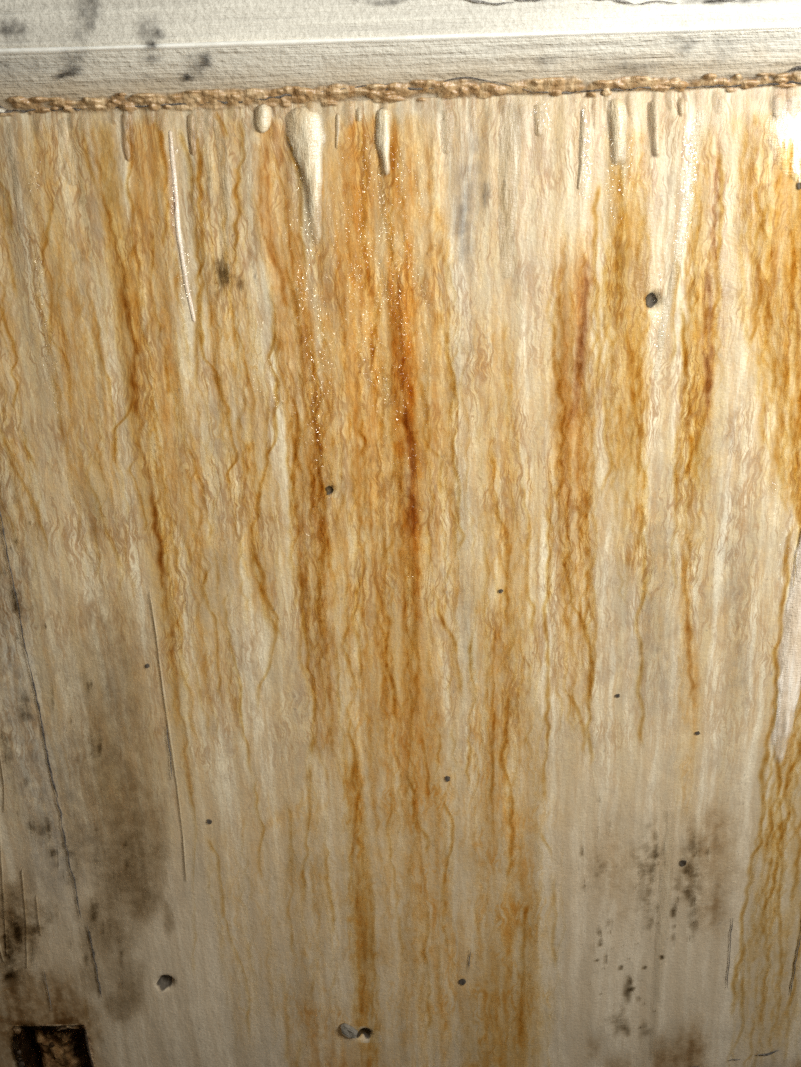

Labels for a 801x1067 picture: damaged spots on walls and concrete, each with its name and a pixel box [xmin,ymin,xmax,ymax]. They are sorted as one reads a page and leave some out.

crack [0,512,101,995]
damp [149,593,187,880]
damp [772,534,801,758]
spalling [12,1024,96,1067]